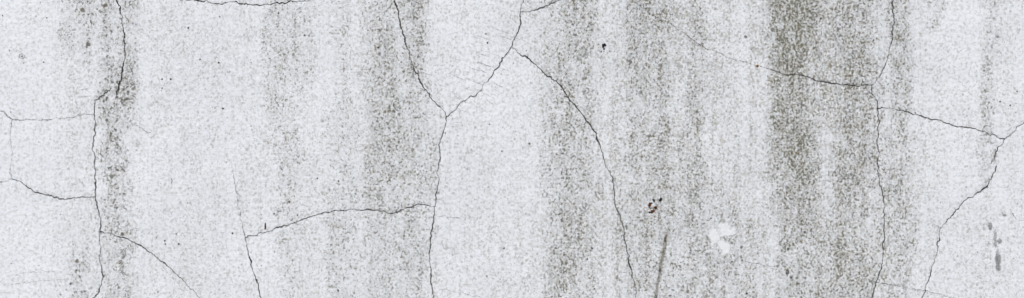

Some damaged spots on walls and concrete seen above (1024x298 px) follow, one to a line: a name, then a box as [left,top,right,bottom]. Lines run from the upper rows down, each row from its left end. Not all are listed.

crack [1,0,197,298]
crack [194,0,305,8]
crack [231,0,636,298]
leakage [561,72,591,249]
leakage [626,0,669,95]
leakage [769,0,882,247]
crack [635,0,1024,298]